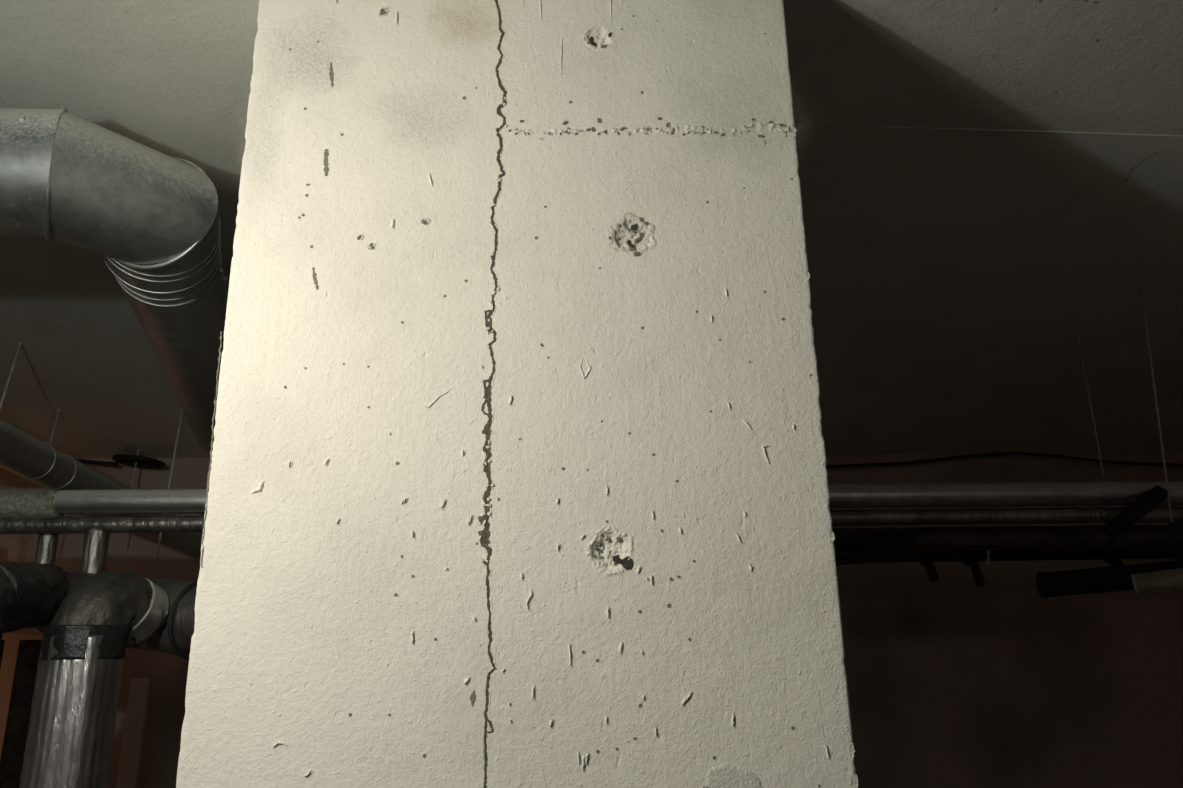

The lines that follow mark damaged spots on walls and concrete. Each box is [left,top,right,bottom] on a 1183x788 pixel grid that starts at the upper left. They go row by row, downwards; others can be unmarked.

spalling [582,24,615,52]
spalling [608,212,657,257]
crack [478,0,507,788]
spalling [584,526,635,577]